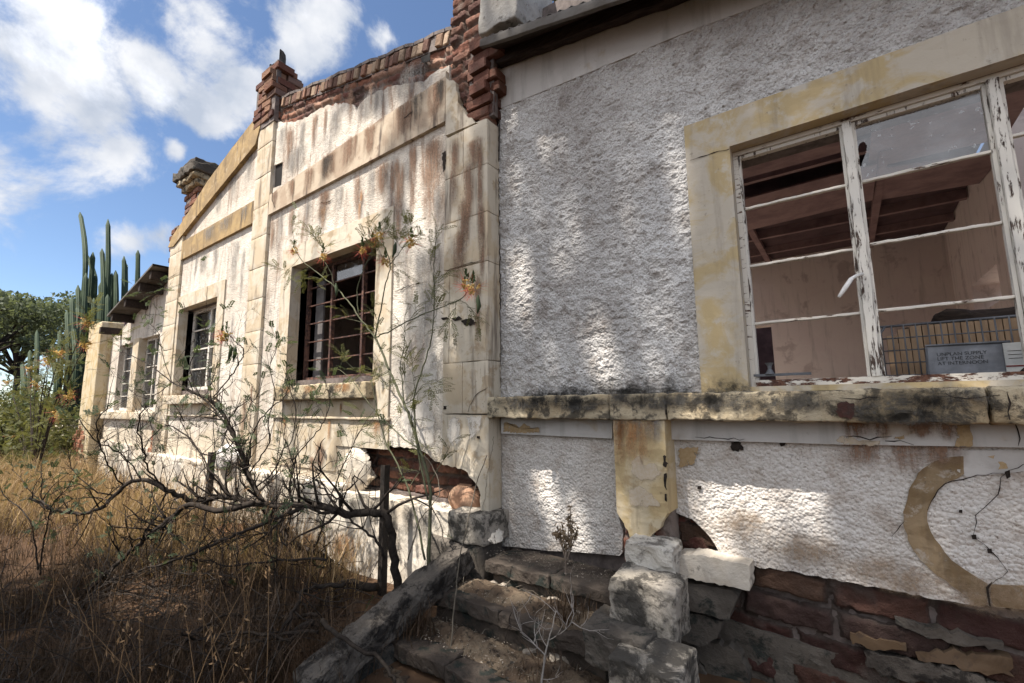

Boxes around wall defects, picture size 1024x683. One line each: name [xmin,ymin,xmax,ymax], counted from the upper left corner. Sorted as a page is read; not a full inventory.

leakage [397,68,443,130]
leakage [273,84,383,201]
leakage [270,188,342,246]
leakage [355,139,482,289]
spalling [365,401,481,498]
leakage [495,381,827,436]
peeling [663,447,701,502]
leakage [845,387,994,469]
crack [927,393,1024,606]